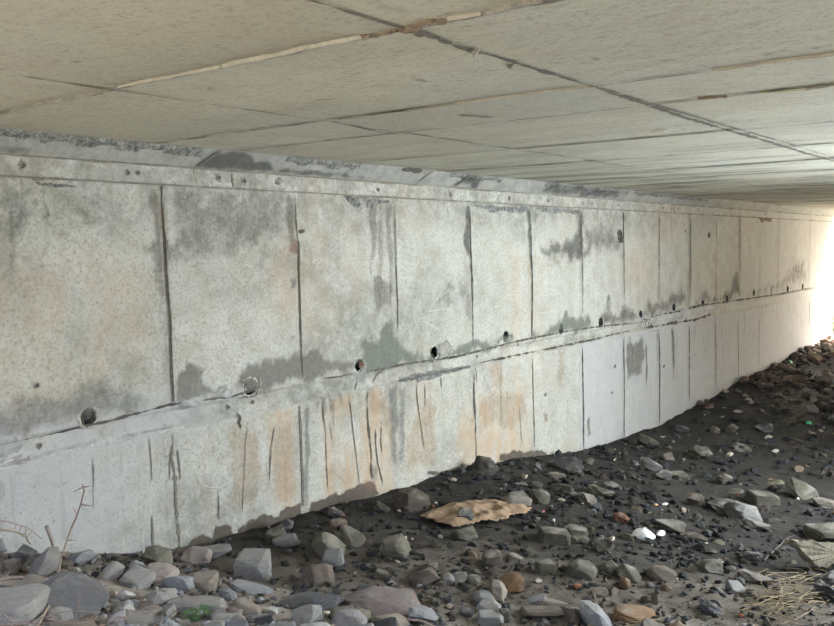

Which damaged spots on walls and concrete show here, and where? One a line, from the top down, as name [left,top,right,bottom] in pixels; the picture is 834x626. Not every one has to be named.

damp [199,152,271,170]
damp [552,217,583,259]
damp [363,324,432,371]
damp [446,335,513,358]
damp [178,364,210,400]
damp [240,351,353,392]